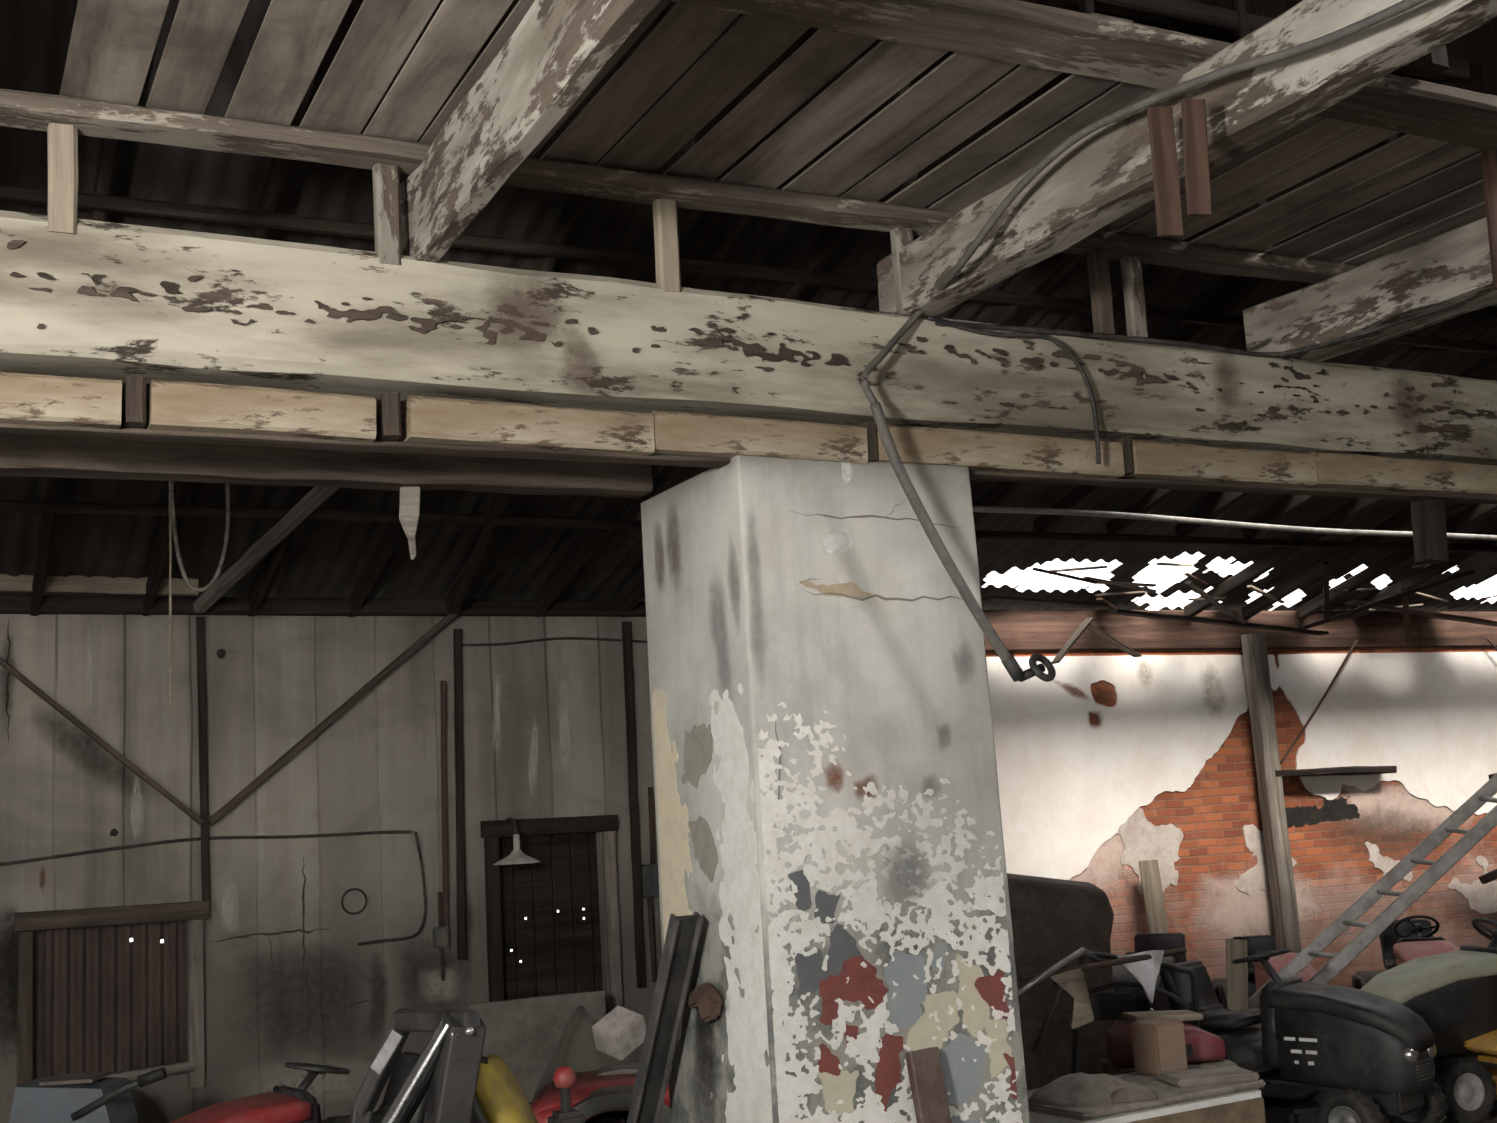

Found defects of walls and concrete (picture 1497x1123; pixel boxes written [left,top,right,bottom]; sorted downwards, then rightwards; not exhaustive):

peeling [77,273,210,313]
peeling [230,297,597,347]
peeling [684,327,895,377]
peeling [907,336,1212,386]
crack [792,499,965,528]
crack [797,579,961,602]
leakage [3,645,12,709]
peeling [1268,652,1497,828]
peeling [652,655,1249,1123]
peeling [1235,824,1270,896]
peeling [1364,841,1413,882]
peeling [1448,856,1497,914]